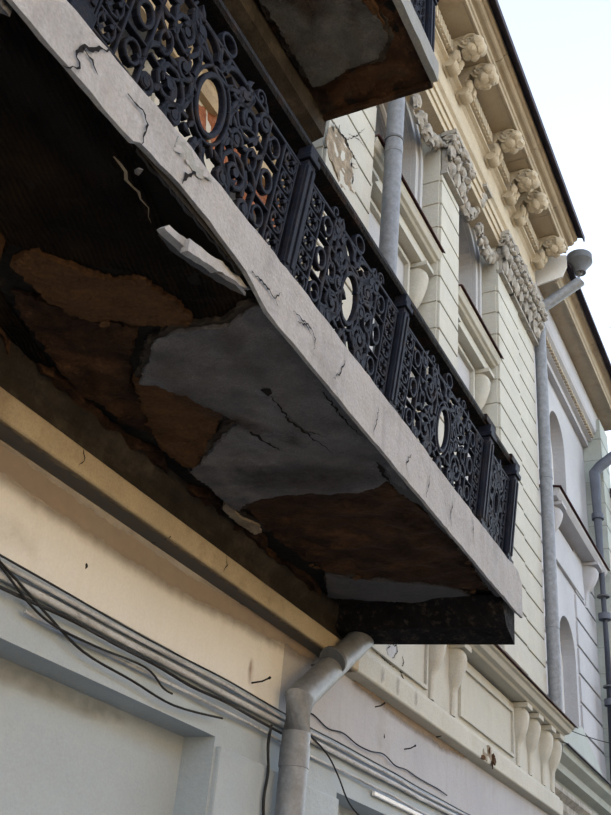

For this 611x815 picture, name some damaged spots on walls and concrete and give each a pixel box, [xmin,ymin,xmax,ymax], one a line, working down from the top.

crack [63,44,112,74]
peeling [295,0,430,115]
crack [128,94,149,145]
flaking render [325,122,358,193]
spalling [0,8,251,476]
crack [252,271,280,303]
crack [295,312,316,349]
crack [250,431,279,450]
crack [271,396,331,452]
crack [323,364,379,437]
crack [376,462,390,482]
peeling [233,481,488,596]